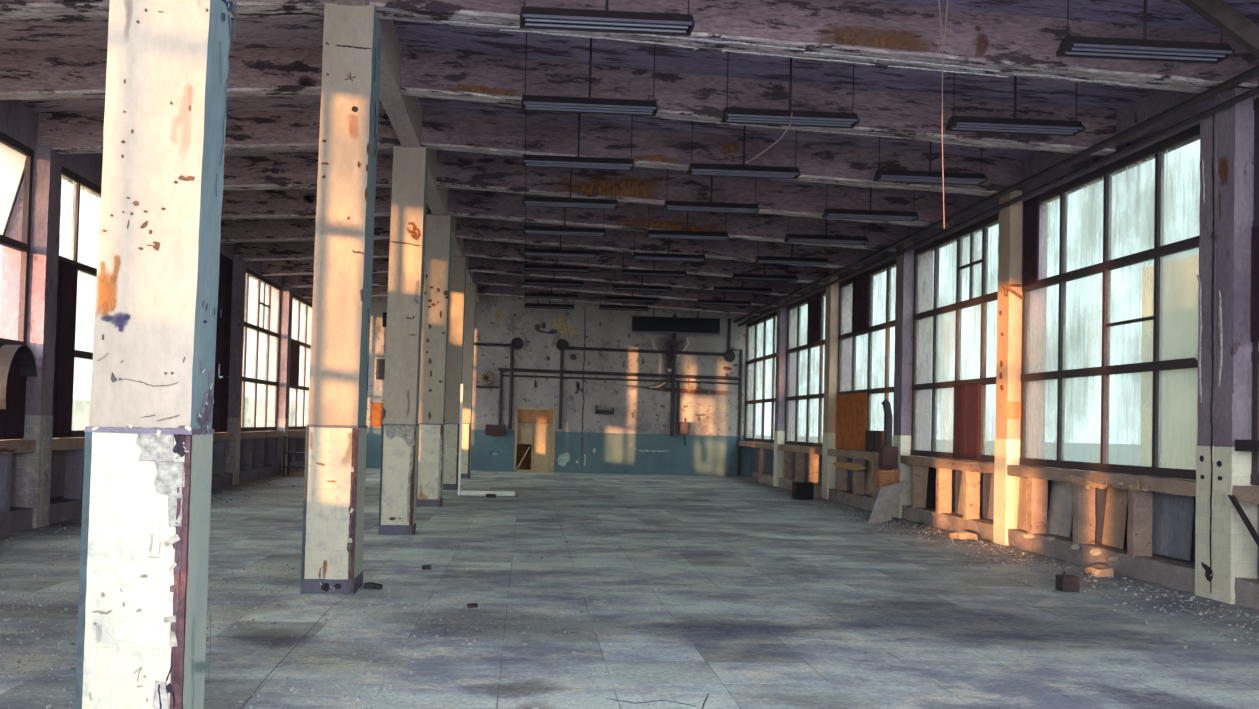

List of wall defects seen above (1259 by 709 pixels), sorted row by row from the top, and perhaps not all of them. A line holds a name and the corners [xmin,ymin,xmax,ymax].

corrosion [97,256,120,314]
peeling [127,359,223,647]
peeling [152,681,169,709]
crack [606,693,709,709]